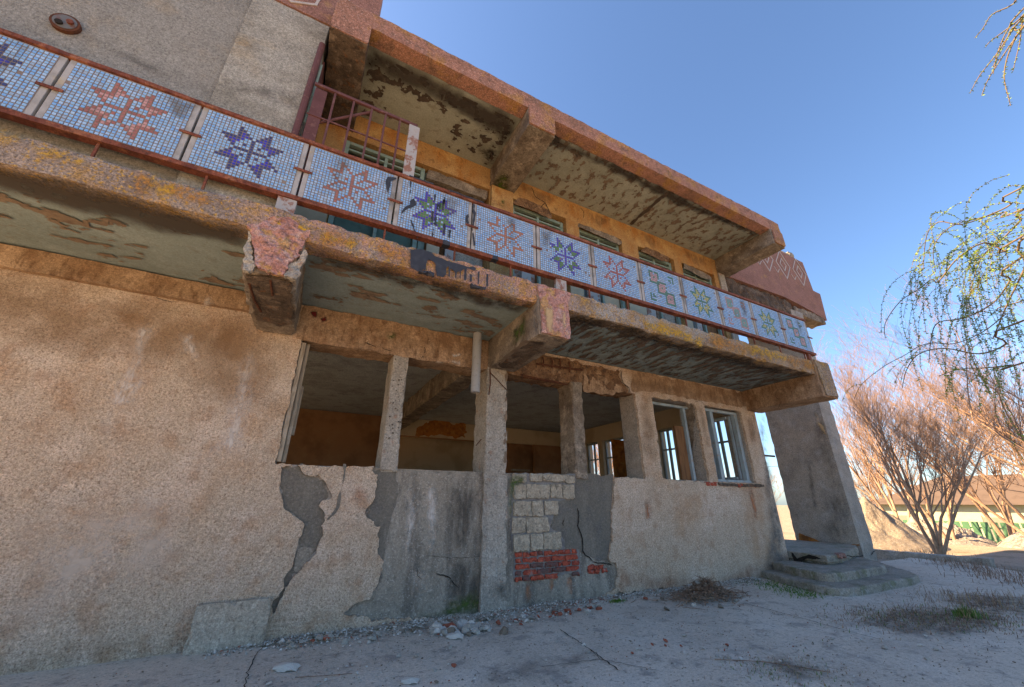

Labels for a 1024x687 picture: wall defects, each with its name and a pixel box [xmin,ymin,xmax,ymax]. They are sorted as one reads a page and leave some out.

peeling [362,65,515,165]
peeling [0,190,148,262]
spalling [189,231,502,337]
spalling [415,420,467,439]
peeling [488,315,806,608]
peeling [272,463,328,613]
peeling [344,468,483,619]
crack [563,508,613,566]